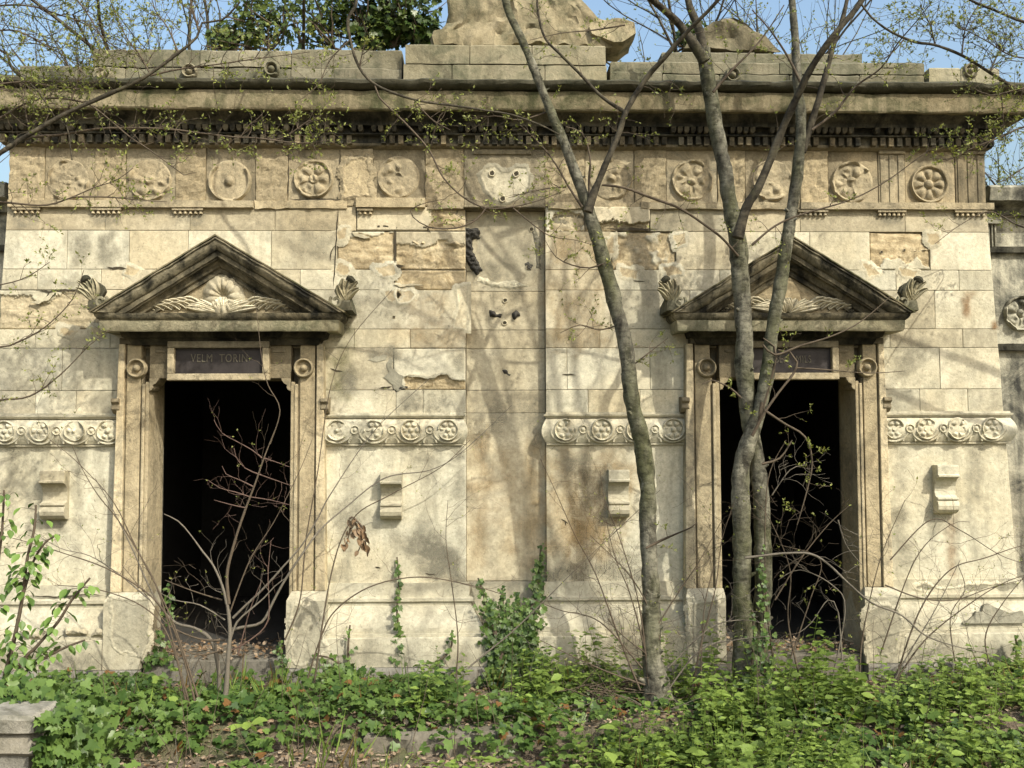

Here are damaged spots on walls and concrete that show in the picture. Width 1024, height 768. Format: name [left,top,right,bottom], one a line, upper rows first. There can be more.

spalling [476,163,534,205]
spalling [331,152,471,333]
spalling [545,207,689,282]
spalling [858,228,943,281]
spalling [369,349,465,392]